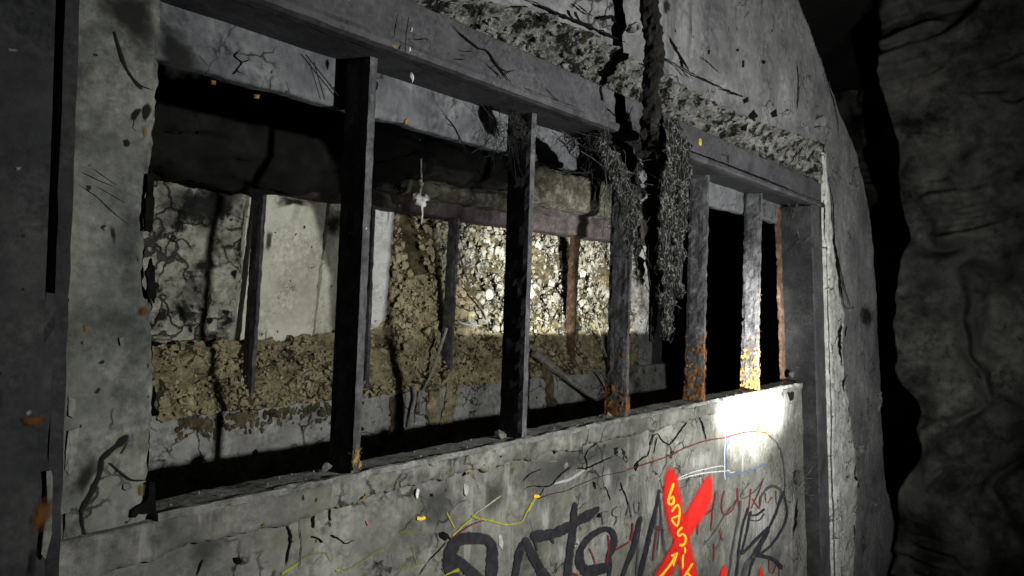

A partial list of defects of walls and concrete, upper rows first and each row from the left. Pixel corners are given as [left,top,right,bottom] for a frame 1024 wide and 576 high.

spalling [411,0,645,104]
corrosion [604,371,630,417]
corrosion [683,335,707,401]
corrosion [740,337,761,390]
crack [638,417,707,463]
crack [523,443,628,504]